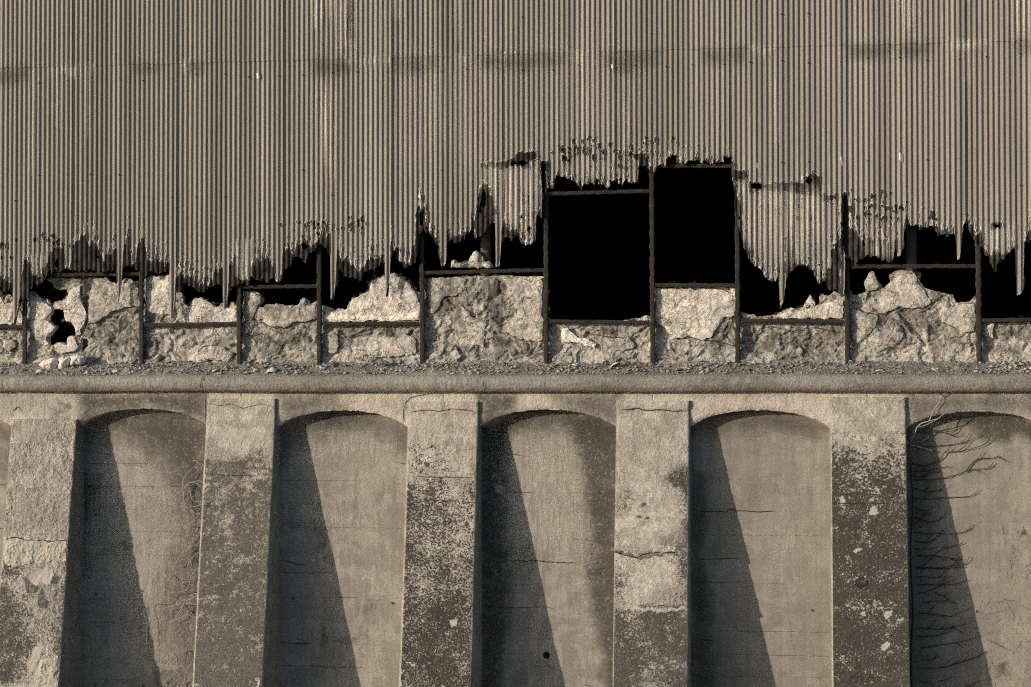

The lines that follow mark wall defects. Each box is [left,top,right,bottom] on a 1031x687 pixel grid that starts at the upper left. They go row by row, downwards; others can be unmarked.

flaking render [187,345,234,381]
flaking render [0,274,487,353]
flaking render [353,335,417,358]
flaking render [503,276,544,342]
flaking render [561,328,596,348]
flaking render [655,287,735,340]
flaking render [773,273,995,345]
crack [613,551,678,561]